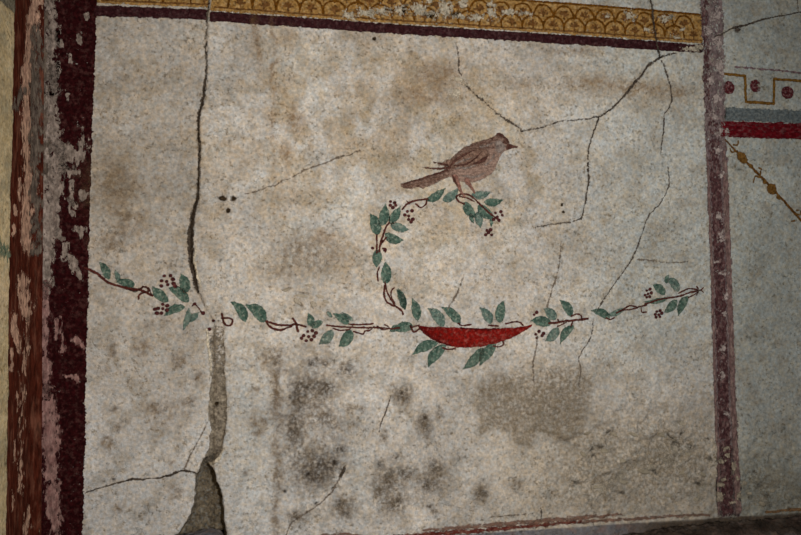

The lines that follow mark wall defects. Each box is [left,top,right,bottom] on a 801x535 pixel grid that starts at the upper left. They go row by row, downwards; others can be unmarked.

peeling [338,0,533,25]
crack [714,0,801,37]
crack [187,0,210,293]
crack [245,150,360,194]
crack [449,0,676,228]
peeling [9,0,91,535]
crack [547,246,562,308]
crack [578,168,685,385]
crack [82,320,227,535]
damp [289,380,330,449]
damp [303,446,343,480]
flaking render [614,420,779,510]